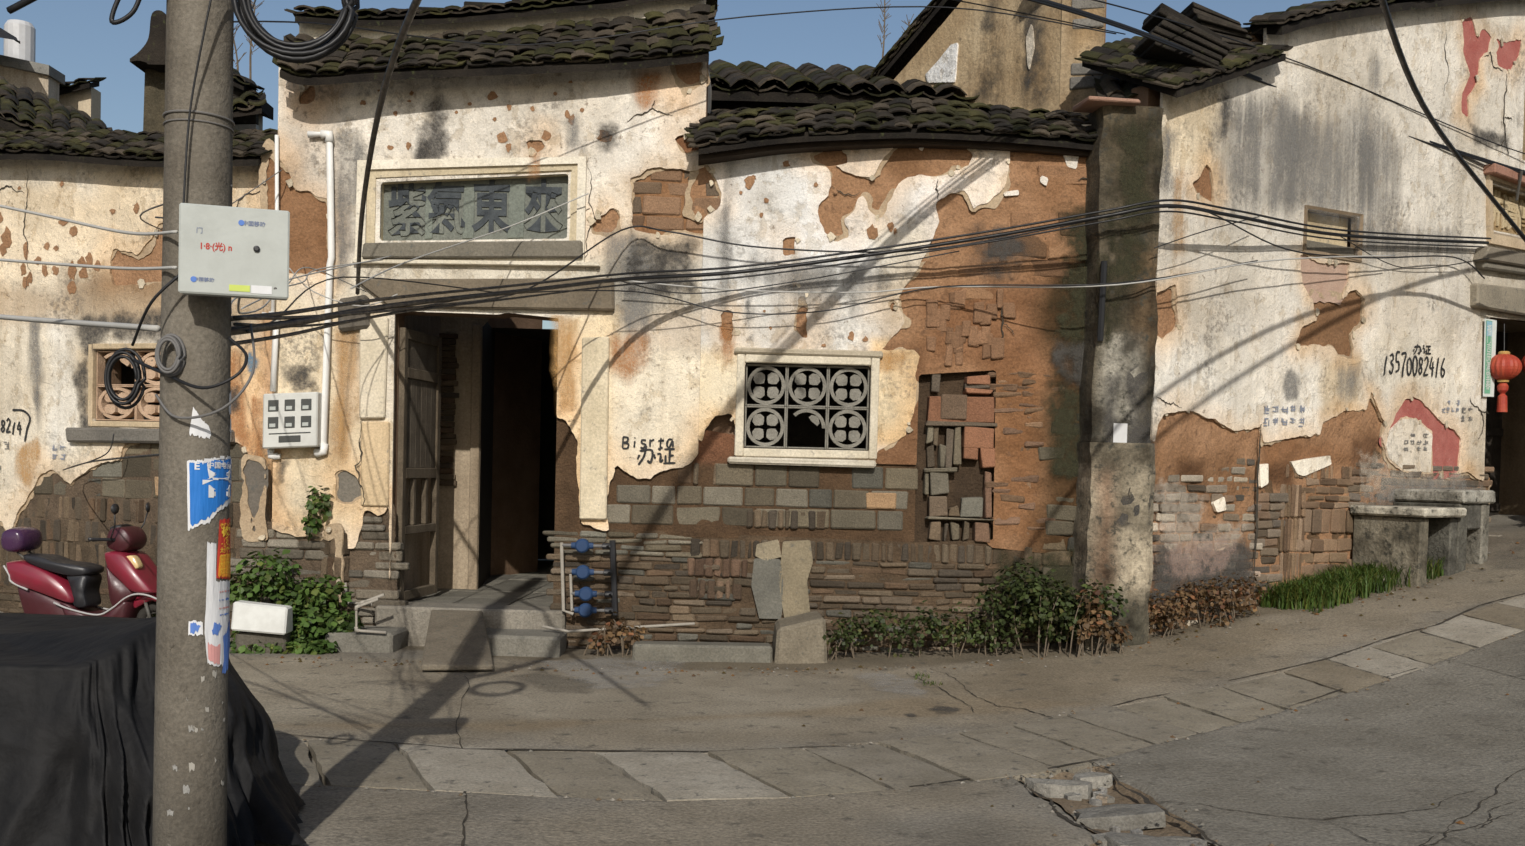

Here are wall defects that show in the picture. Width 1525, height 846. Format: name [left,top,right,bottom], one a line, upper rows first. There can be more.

peeling [1460,14,1521,116]
peeling [0,212,163,294]
water stain [1107,122,1170,308]
peeling [1193,166,1213,201]
water stain [1221,96,1450,255]
peeling [1295,255,1366,359]
peeling [542,134,1087,653]
water stain [1105,370,1151,443]
peeling [1148,392,1494,635]
crack [906,668,1053,718]
crack [1021,775,1101,833]
crack [1090,751,1524,846]